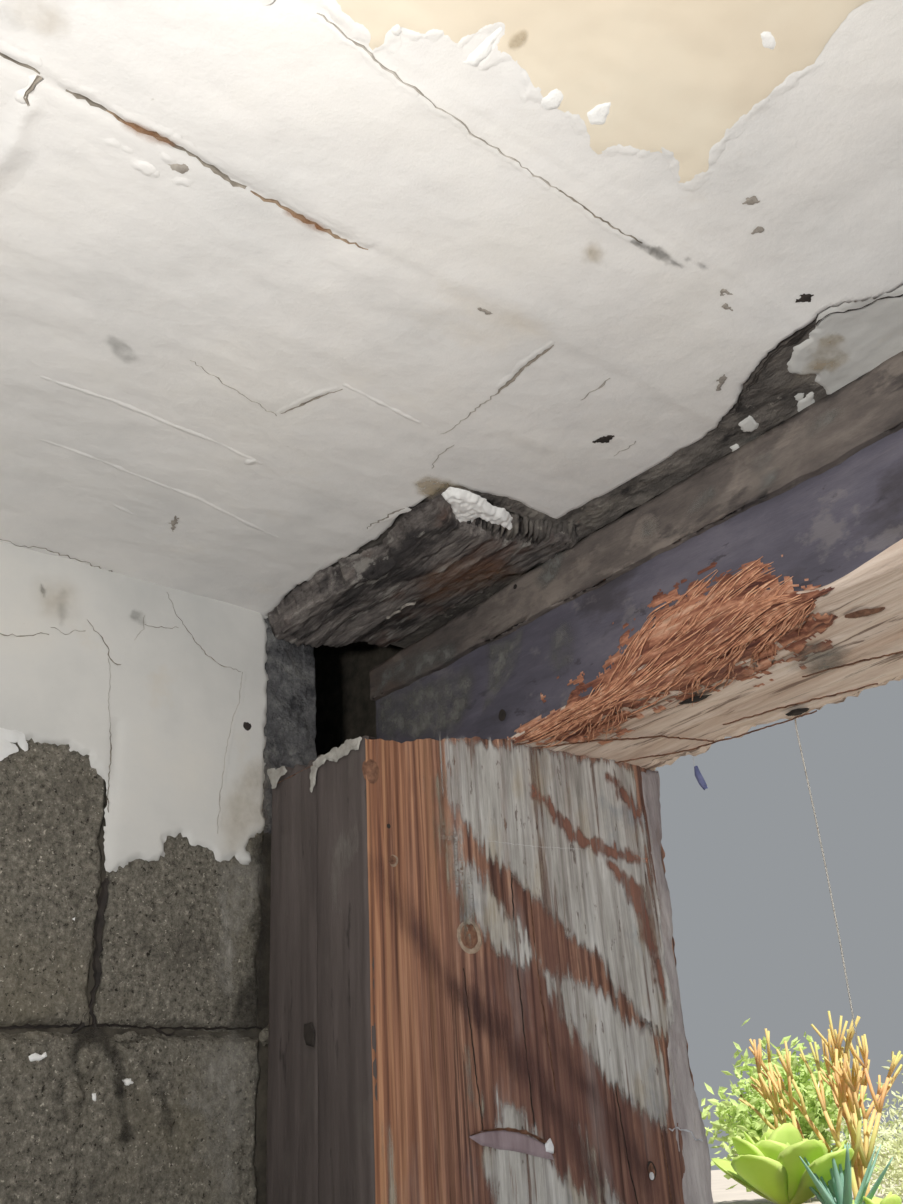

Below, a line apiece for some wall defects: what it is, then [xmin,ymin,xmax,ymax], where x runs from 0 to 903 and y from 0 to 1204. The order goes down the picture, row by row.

crack [0,42,374,250]
crack [308,10,666,255]
peeling [316,0,871,192]
crack [190,360,343,416]
spalling [268,285,903,648]
crack [0,621,121,812]
damp [74,1026,124,1099]
crack [0,878,262,1036]
flaking render [0,738,269,1204]